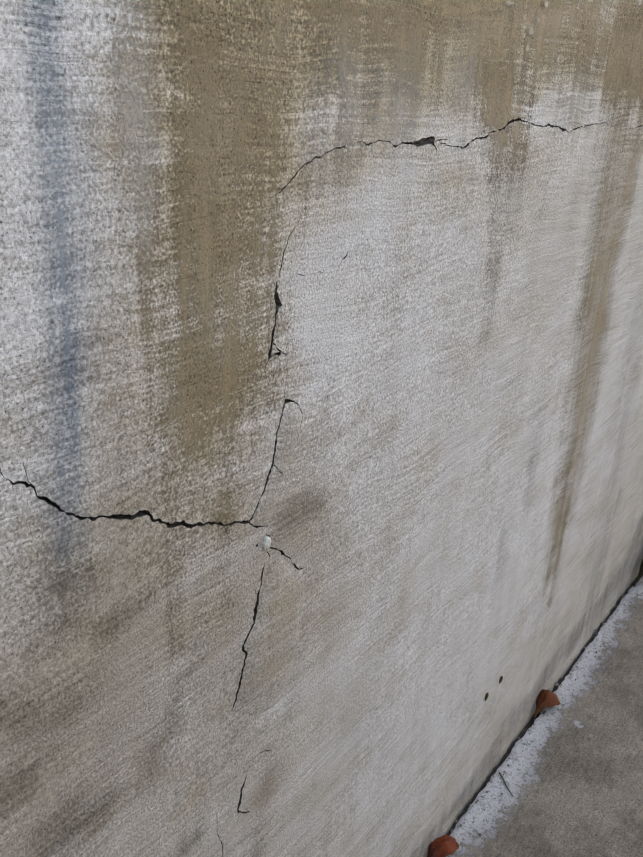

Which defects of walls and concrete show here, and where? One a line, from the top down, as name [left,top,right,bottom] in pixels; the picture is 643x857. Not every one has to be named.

crack [273,117,643,197]
crack [253,217,348,393]
damp [116,0,643,586]
crack [0,394,303,537]
crack [232,547,302,709]